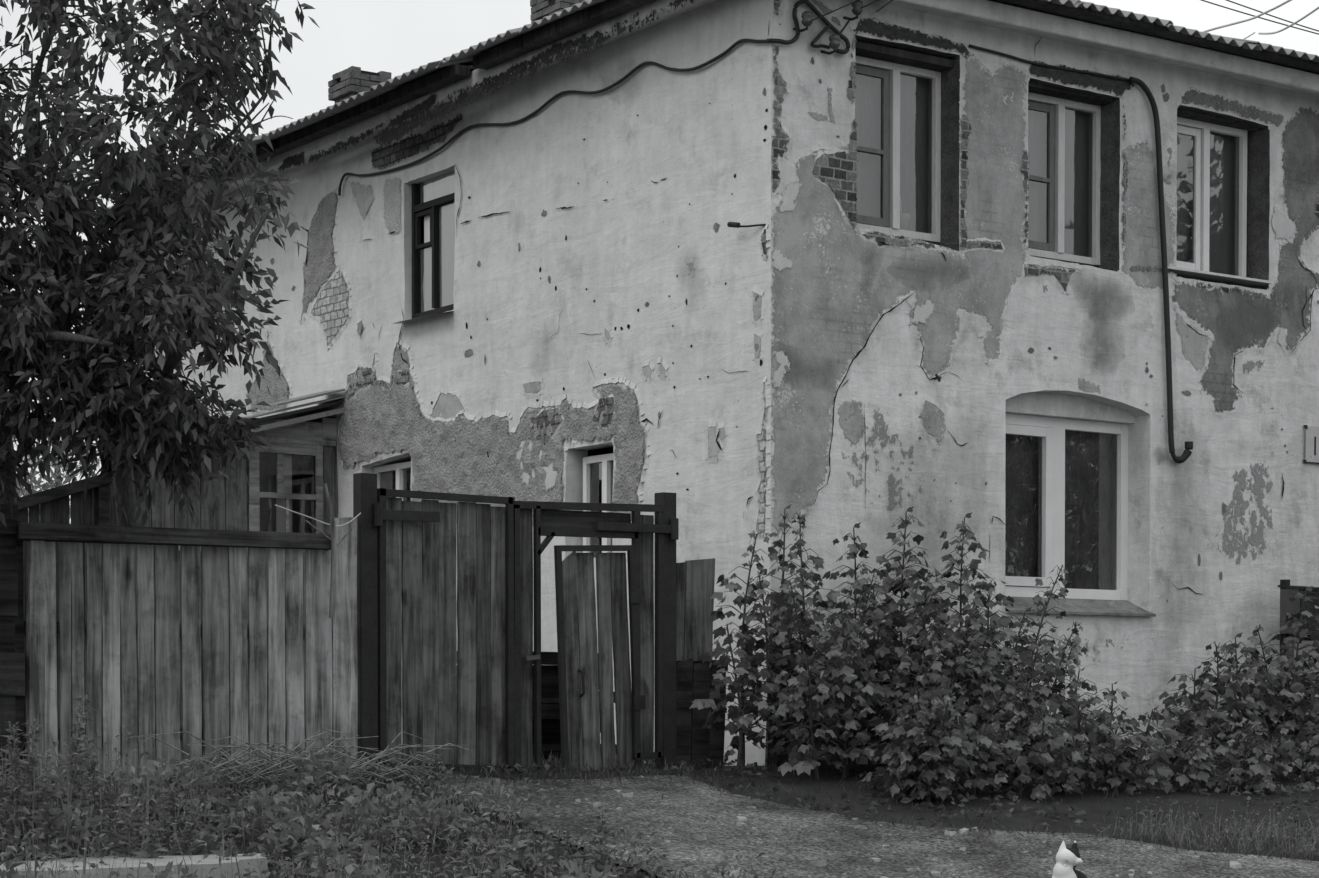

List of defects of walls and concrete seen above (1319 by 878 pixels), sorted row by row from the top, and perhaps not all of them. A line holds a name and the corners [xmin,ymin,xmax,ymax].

peeling [278,0,697,352]
peeling [749,11,1319,545]
peeling [337,339,675,529]
peeling [705,421,737,464]
peeling [1218,463,1273,564]